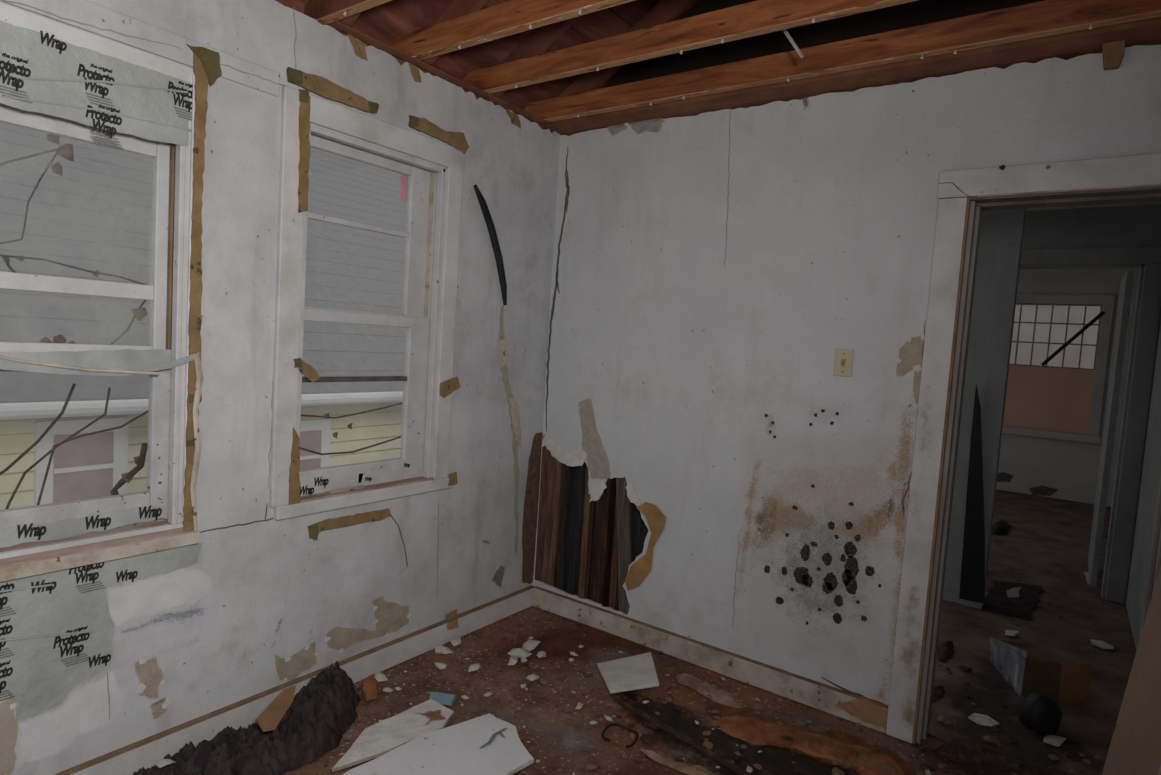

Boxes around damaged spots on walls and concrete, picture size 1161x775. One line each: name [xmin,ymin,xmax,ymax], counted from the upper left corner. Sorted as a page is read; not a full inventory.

crack [546,147,570,431]
peeling [895,335,925,405]
peeling [522,399,611,584]
spalling [626,481,641,506]
peeling [274,595,412,681]
leakage [729,384,1111,775]
peeling [0,657,173,775]
leakage [600,691,857,775]